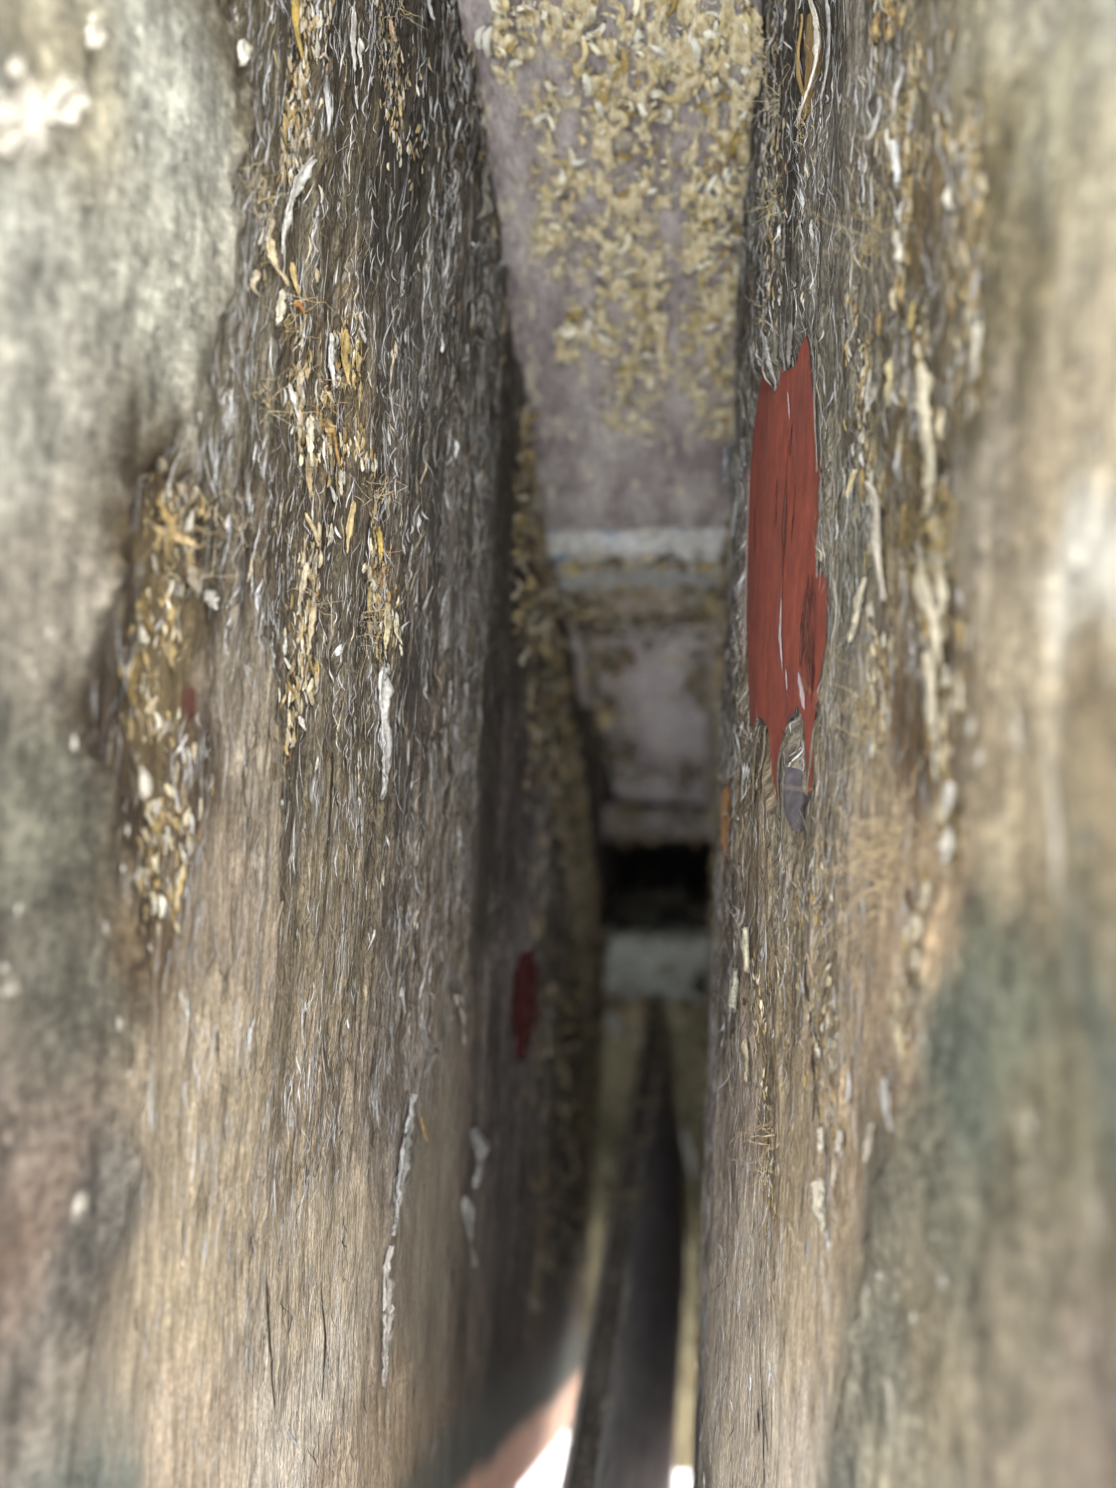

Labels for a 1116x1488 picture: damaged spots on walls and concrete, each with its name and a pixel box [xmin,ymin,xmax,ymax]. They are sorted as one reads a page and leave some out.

peeling [118,456,219,952]
peeling [248,0,439,784]
peeling [468,0,994,1233]
crack [804,957,827,1164]